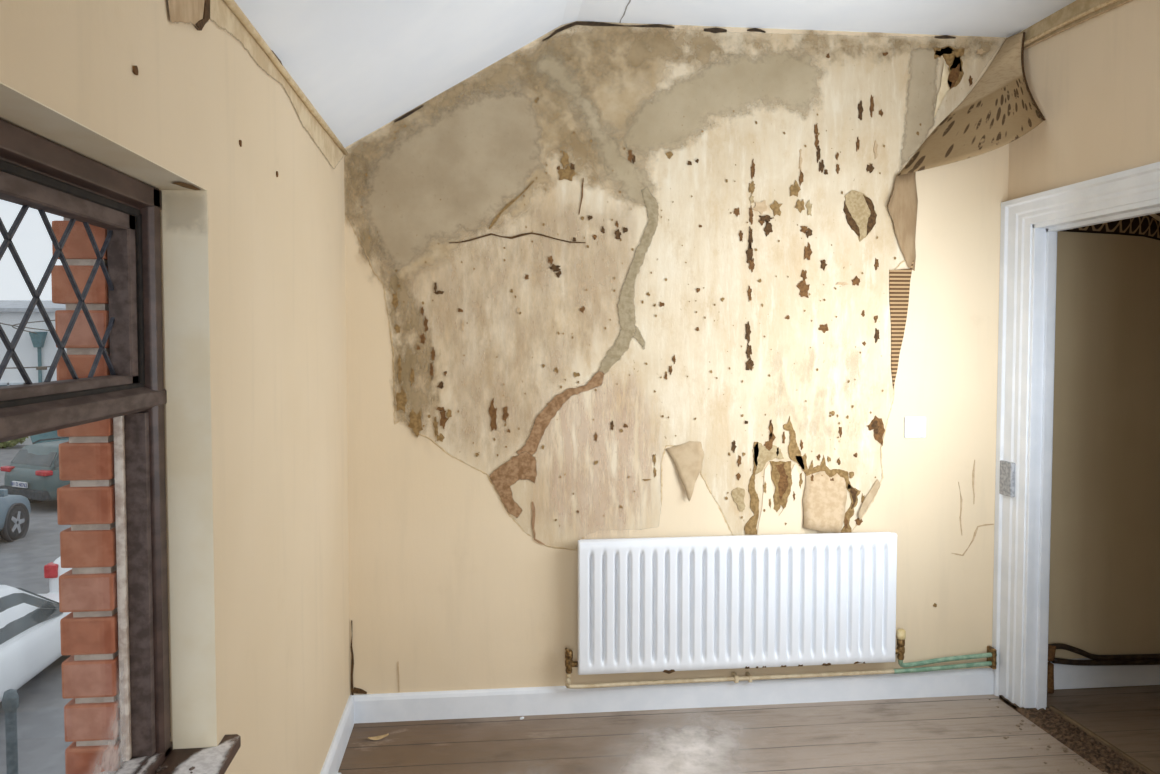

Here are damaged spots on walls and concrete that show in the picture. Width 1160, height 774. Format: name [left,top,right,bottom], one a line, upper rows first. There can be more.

flaking render [210,0,1005,550]
flaking render [1021,0,1127,48]